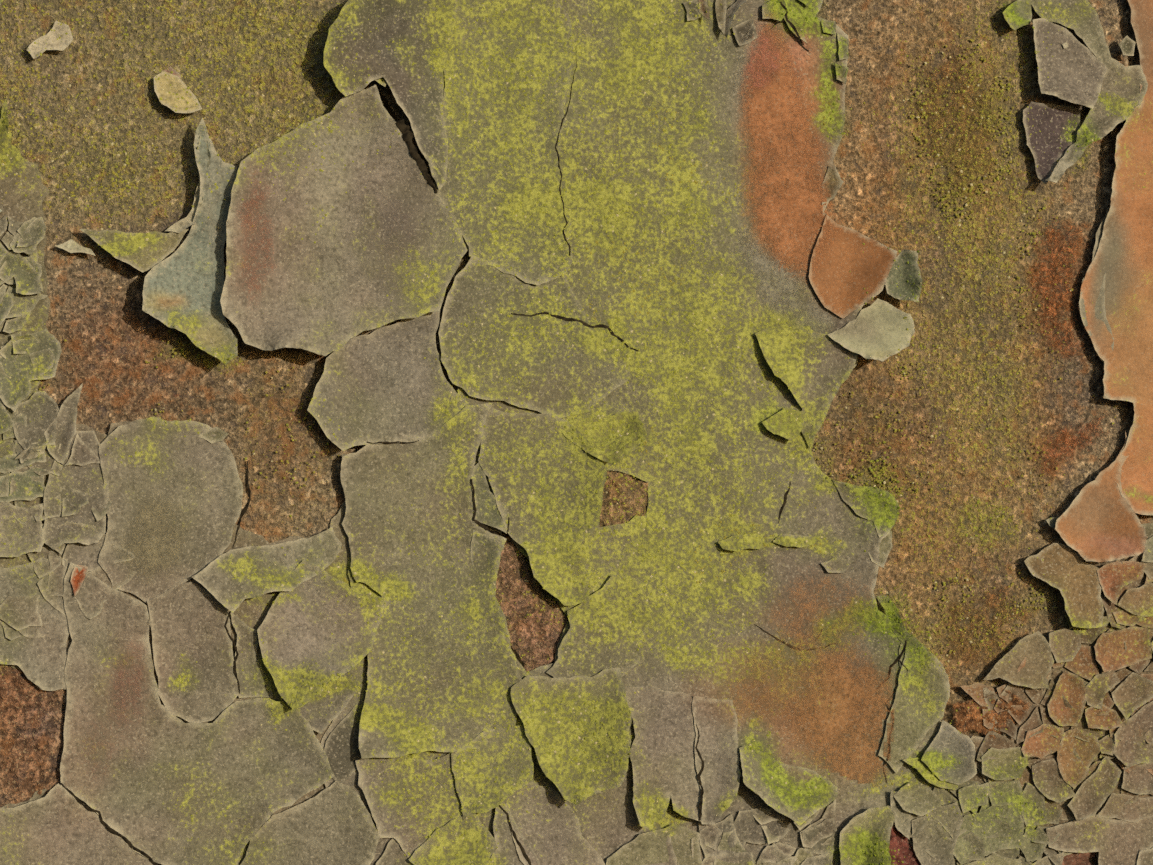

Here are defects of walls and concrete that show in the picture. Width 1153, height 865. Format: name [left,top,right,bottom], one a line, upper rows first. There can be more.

peeling [27,20,73,59]
peeling [154,67,202,114]
crack [378,89,438,193]
rust [744,24,832,275]
crack [511,312,639,352]
damp [745,247,832,338]
rust [1031,226,1082,354]
rust [750,589,894,786]
rust [953,690,1028,738]
crack [695,724,704,821]
crack [61,783,159,865]
crack [499,805,531,865]